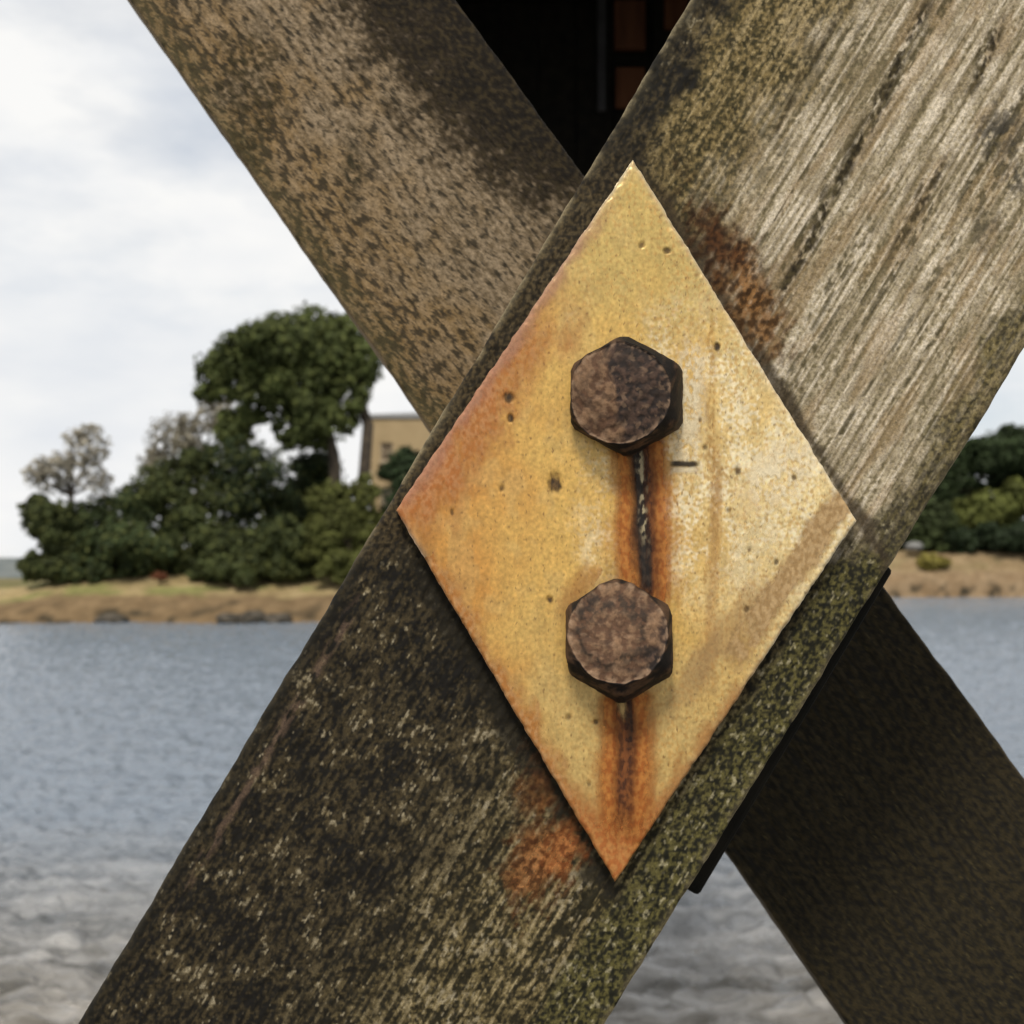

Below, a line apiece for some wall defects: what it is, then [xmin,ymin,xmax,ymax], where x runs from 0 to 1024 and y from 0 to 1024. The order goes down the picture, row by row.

corrosion [686,199,795,359]
corrosion [396,337,536,522]
corrosion [616,440,668,602]
corrosion [425,554,739,913]